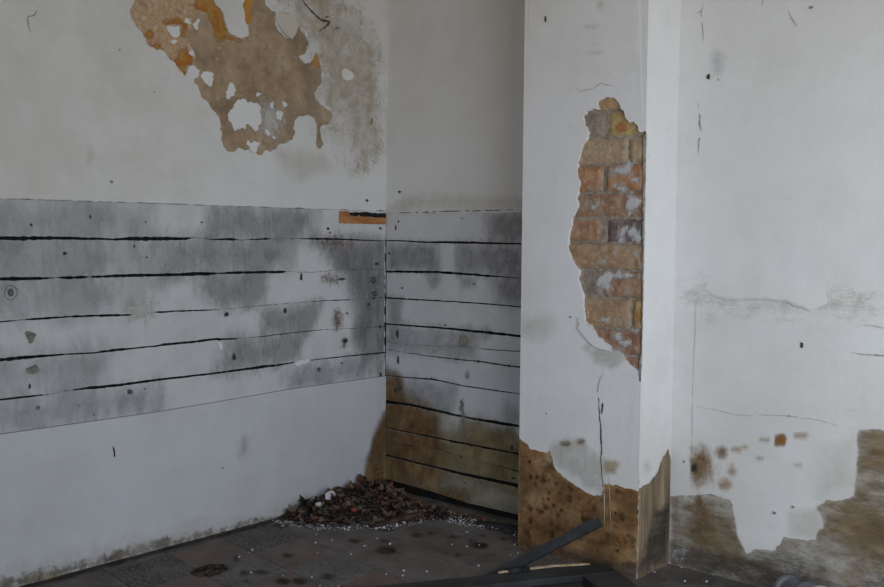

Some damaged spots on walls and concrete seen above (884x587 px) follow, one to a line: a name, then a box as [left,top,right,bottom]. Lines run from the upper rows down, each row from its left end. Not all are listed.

peeling [130,0,380,172]
leakage [61,205,102,233]
crack [8,198,323,210]
leakage [168,206,304,308]
leakage [295,243,439,385]
leakage [410,385,519,514]
leakage [456,214,522,300]
crack [598,376,611,526]
spalling [569,97,647,382]
peeling [518,429,884,587]
crack [691,292,852,476]